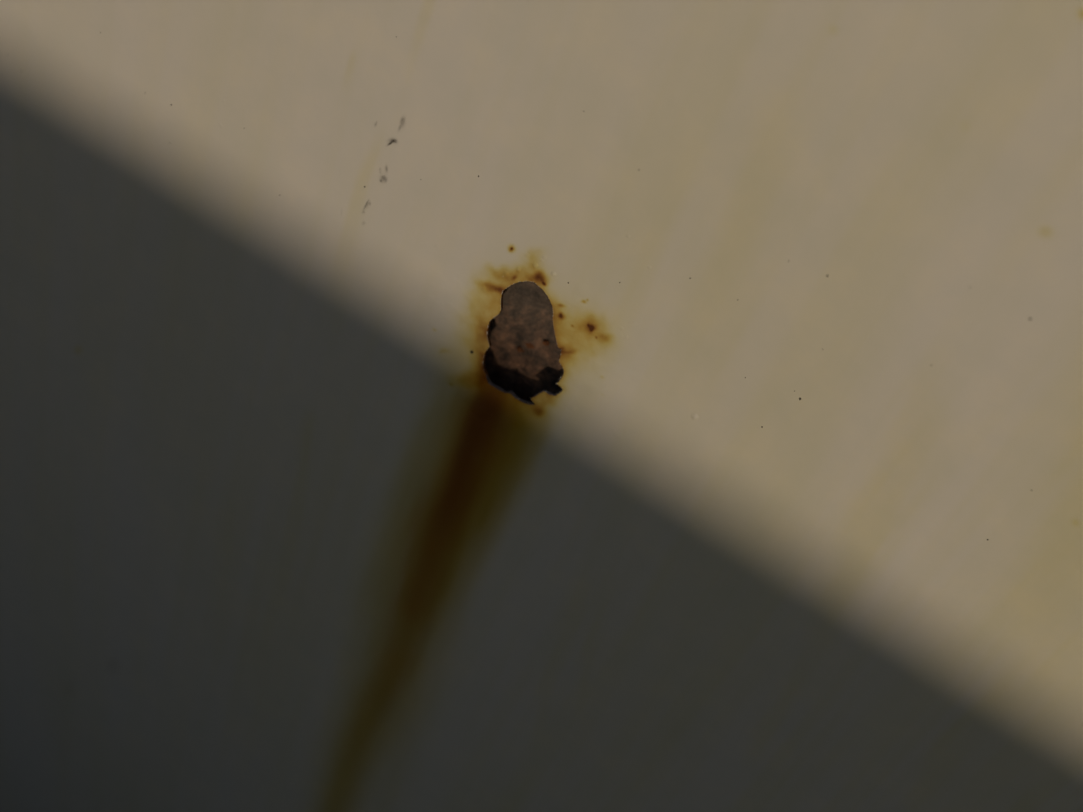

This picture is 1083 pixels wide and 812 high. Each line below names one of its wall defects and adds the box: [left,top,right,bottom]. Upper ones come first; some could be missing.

spalling [485,281,563,402]